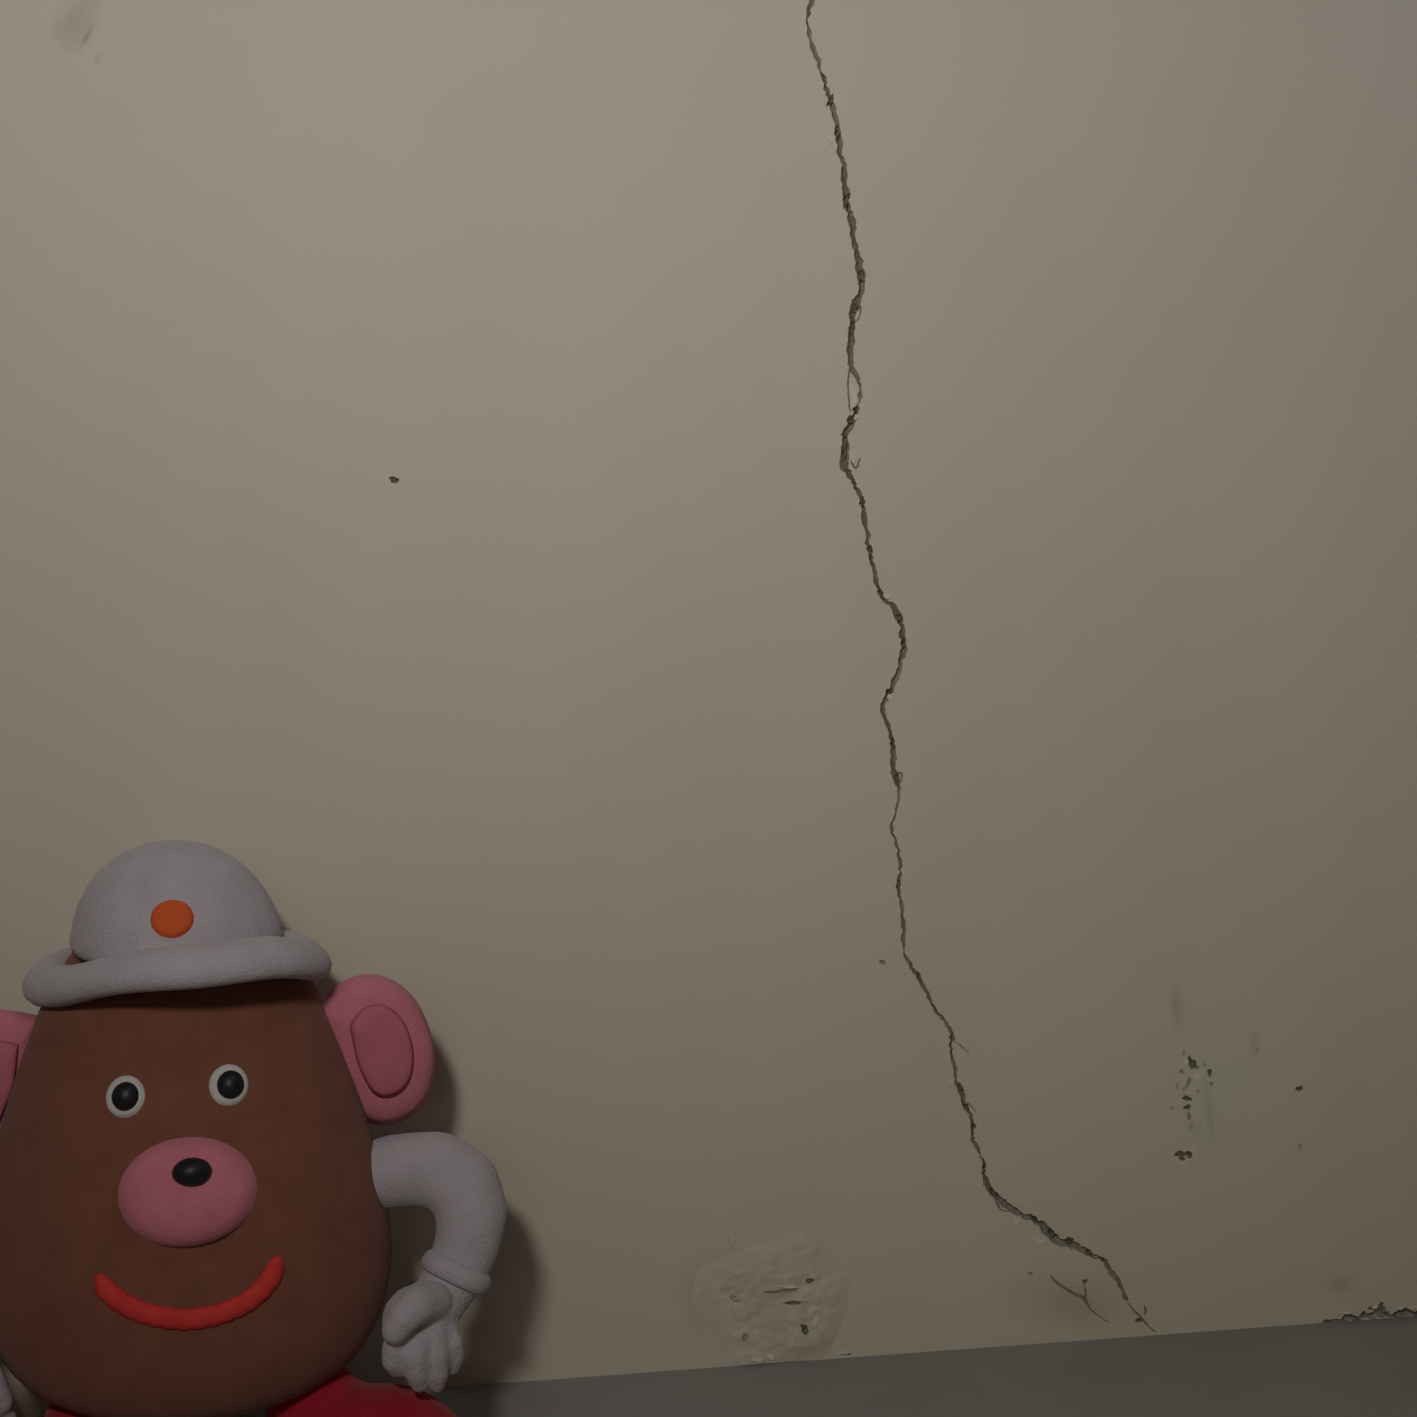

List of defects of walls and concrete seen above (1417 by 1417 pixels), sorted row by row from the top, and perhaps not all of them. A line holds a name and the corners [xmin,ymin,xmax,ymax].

crack [806,0,1156,1332]
peeling [691,1224,851,1365]
flaking render [1323,1302,1417,1323]